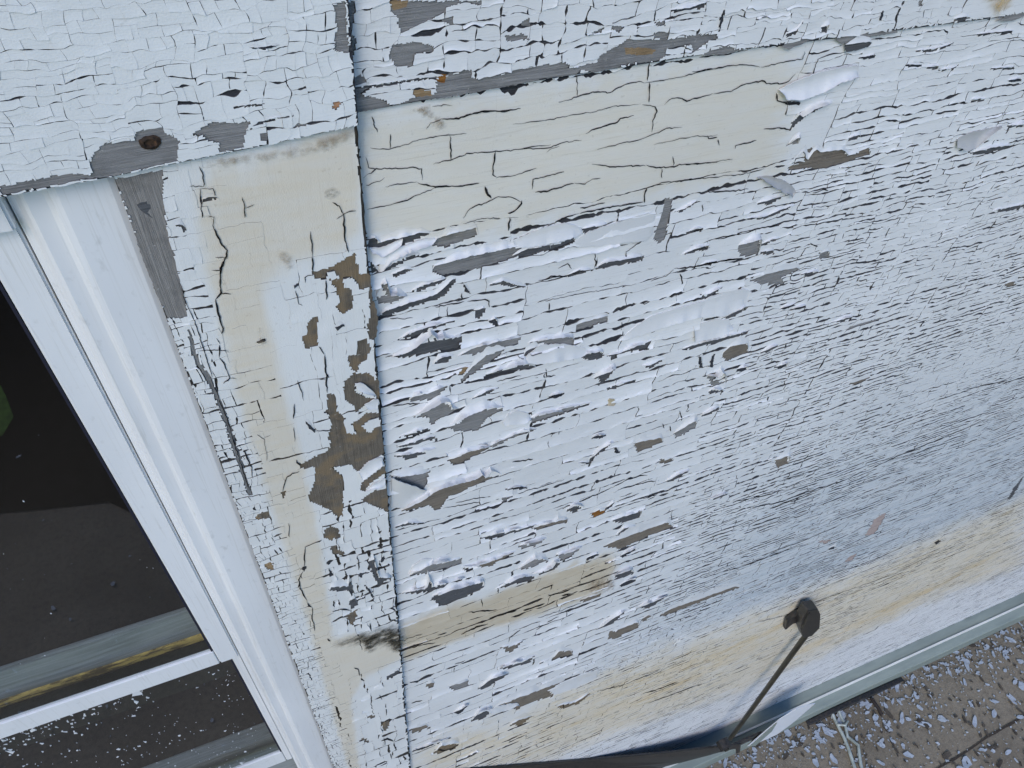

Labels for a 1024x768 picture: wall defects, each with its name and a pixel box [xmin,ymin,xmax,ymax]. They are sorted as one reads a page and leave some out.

peeling [0,127,187,318]
crack [332,51,846,310]
peeling [992,203,1024,211]
crack [179,167,329,489]
peeling [300,0,897,625]
peeling [597,584,740,639]
peeling [387,668,435,688]
peeling [448,639,572,690]
peeling [453,677,590,726]
peeling [410,723,460,754]